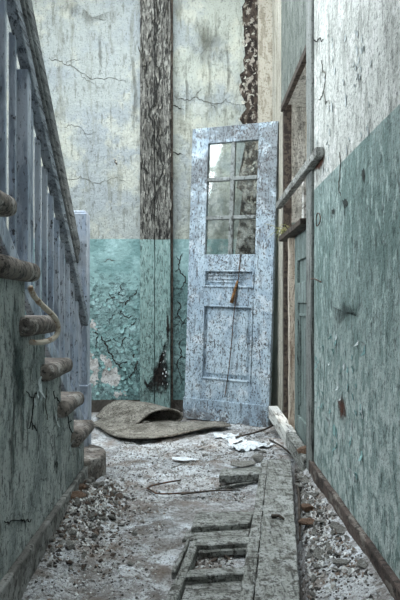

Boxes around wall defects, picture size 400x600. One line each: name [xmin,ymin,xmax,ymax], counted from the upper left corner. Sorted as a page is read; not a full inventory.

crack [50,59,125,83]
crack [173,89,238,110]
spalling [238,0,258,124]
spalling [235,141,258,254]
peeling [90,291,139,399]
crack [94,283,139,387]
damp [144,308,170,395]
crack [175,253,187,383]
crack [26,388,60,431]